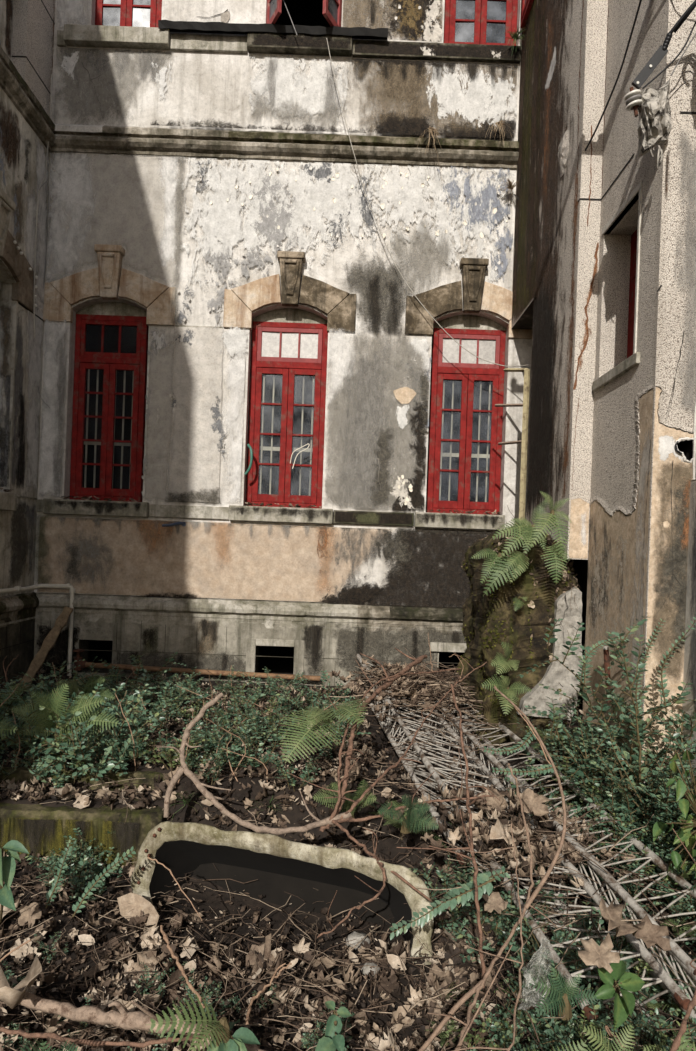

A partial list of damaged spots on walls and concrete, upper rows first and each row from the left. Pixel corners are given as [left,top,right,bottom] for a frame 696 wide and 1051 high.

water stain [0,102,140,584]
water stain [55,47,171,125]
peeling [208,396,228,457]
peeling [144,157,514,443]
water stain [167,222,498,608]
water stain [151,0,547,323]
peeling [390,474,414,509]
crack [564,0,609,494]
spalling [569,383,694,779]